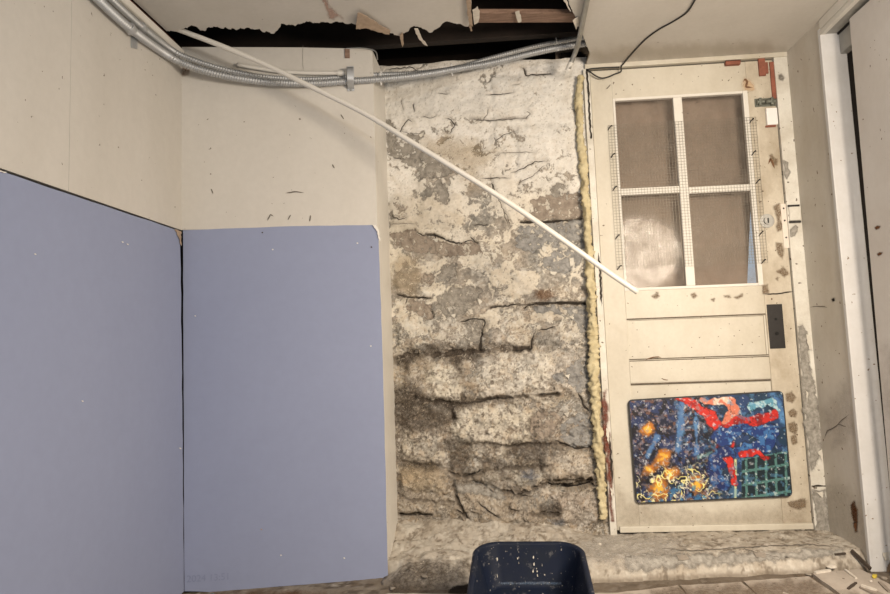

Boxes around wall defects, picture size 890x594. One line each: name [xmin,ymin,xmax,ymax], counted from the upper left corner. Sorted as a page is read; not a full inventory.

peeling [469,2,480,31]
spalling [786,325,823,470]